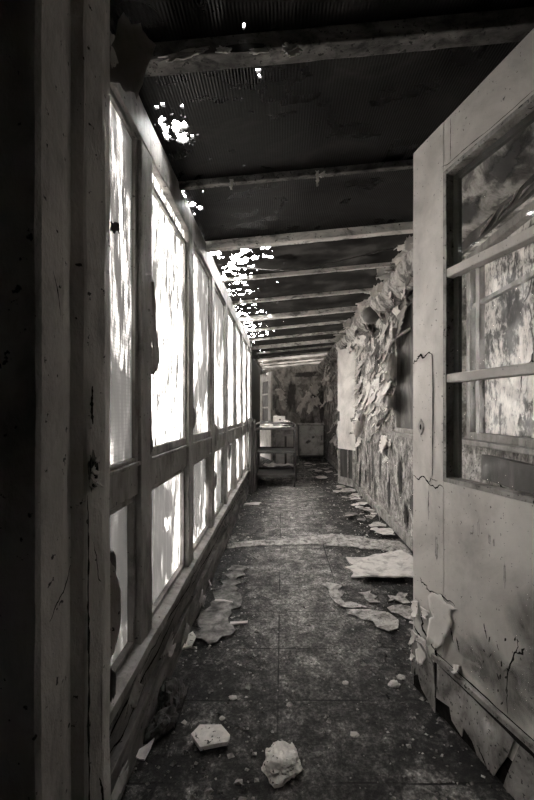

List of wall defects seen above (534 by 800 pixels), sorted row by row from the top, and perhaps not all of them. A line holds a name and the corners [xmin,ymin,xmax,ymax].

peeling [274,235,413,464]
crack [413,352,444,520]
peeling [408,578,459,666]
crack [505,641,525,713]